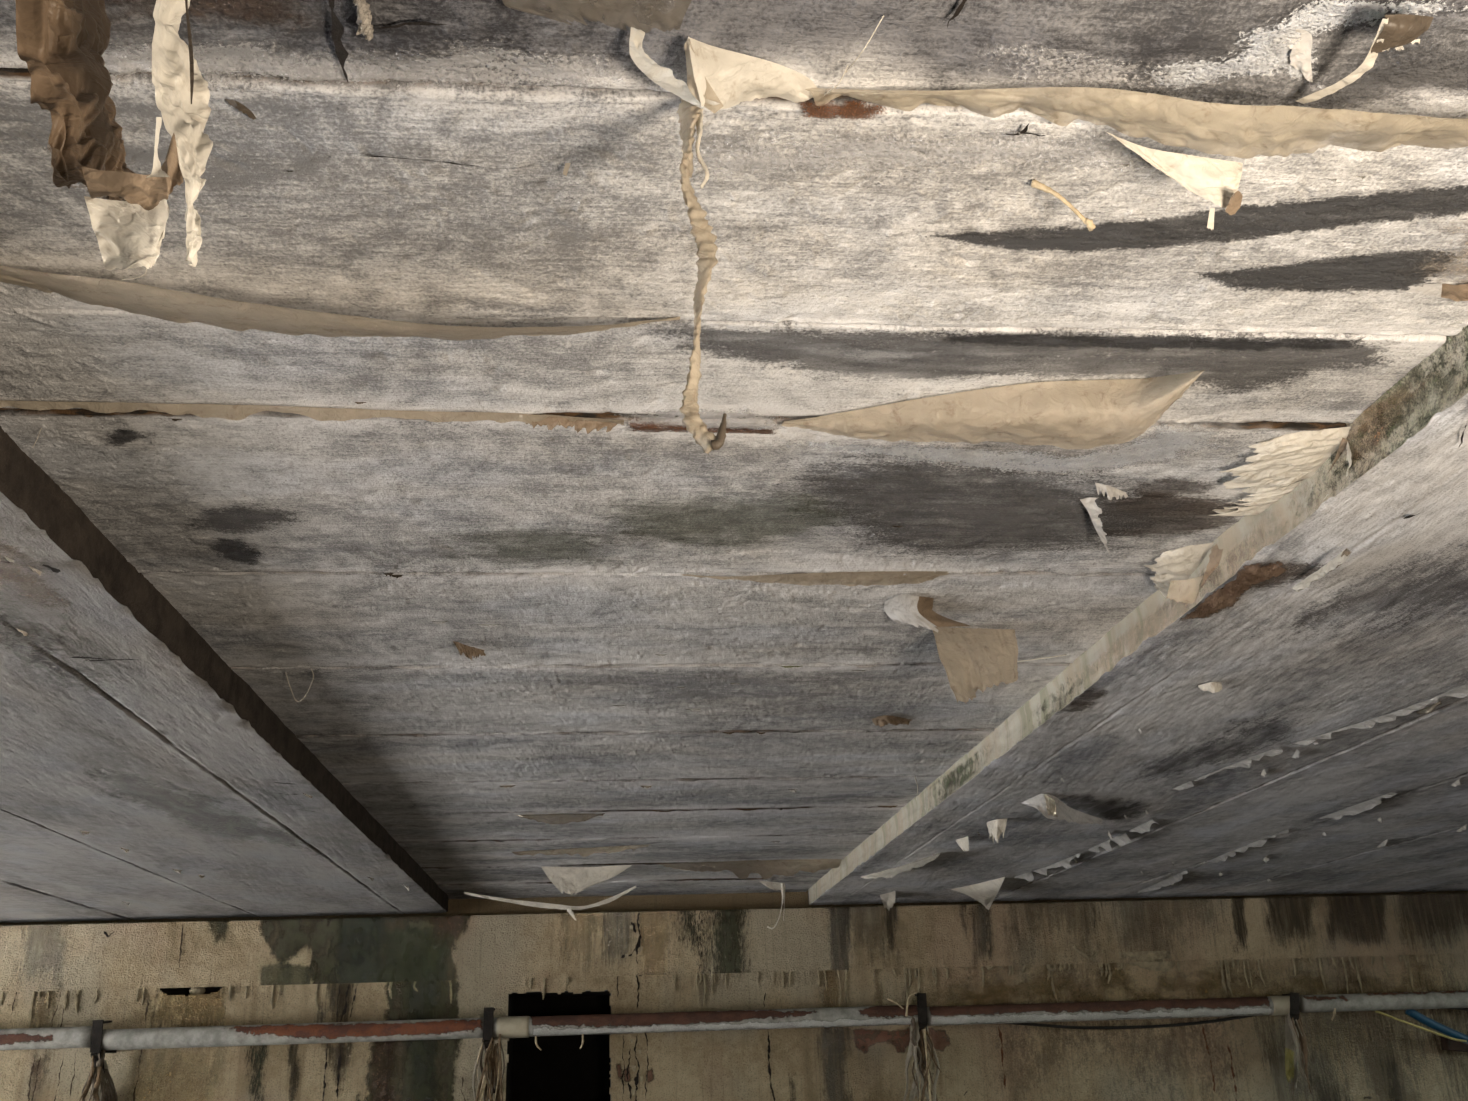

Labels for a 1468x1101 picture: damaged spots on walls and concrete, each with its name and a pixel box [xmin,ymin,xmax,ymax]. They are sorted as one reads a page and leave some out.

peeling [1198,682,1222,693]
peeling [1173,684,1468,790]
peeling [1014,811,1158,881]
peeling [1138,829,1289,893]
peeling [1312,792,1398,848]
water stain [674,909,752,973]
water stain [828,907,850,970]
water stain [886,906,897,949]
water stain [959,904,992,958]
water stain [1231,893,1468,953]
water stain [153,986,225,1027]
corrosion [956,966,1436,1005]